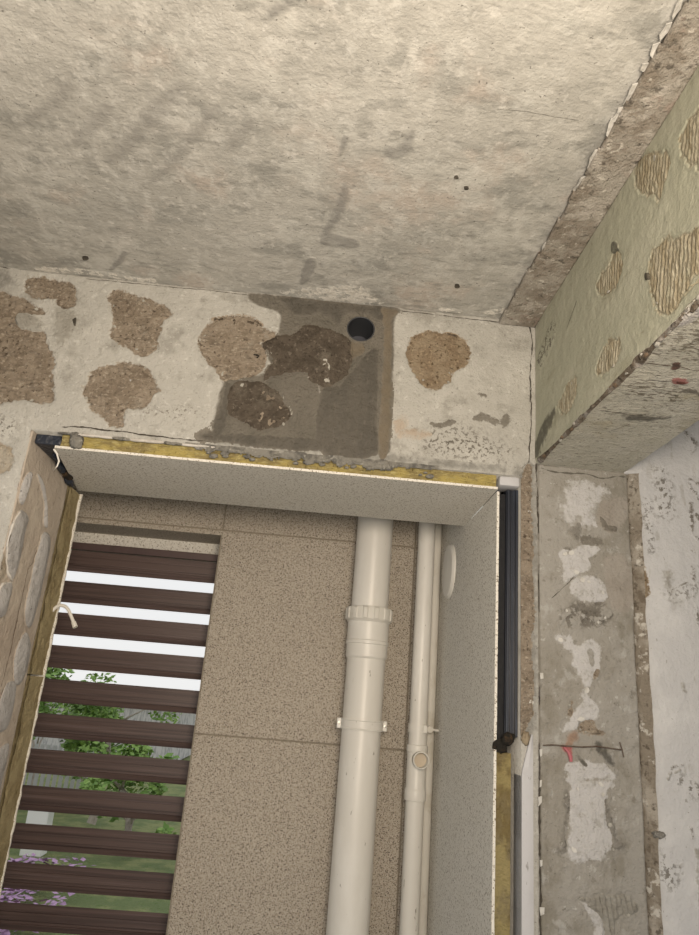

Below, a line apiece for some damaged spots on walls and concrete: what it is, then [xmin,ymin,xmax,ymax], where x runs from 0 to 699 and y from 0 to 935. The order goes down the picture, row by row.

peeling [640,0,683,72]
peeling [606,82,638,137]
spalling [632,103,699,207]
spalling [0,273,80,407]
spalling [79,286,214,431]
spalling [195,312,353,431]
spalling [403,328,475,394]
spalling [536,220,699,464]
spalling [407,410,528,469]
flaking render [558,475,613,534]
spalling [640,455,699,605]
flaking render [553,544,617,740]